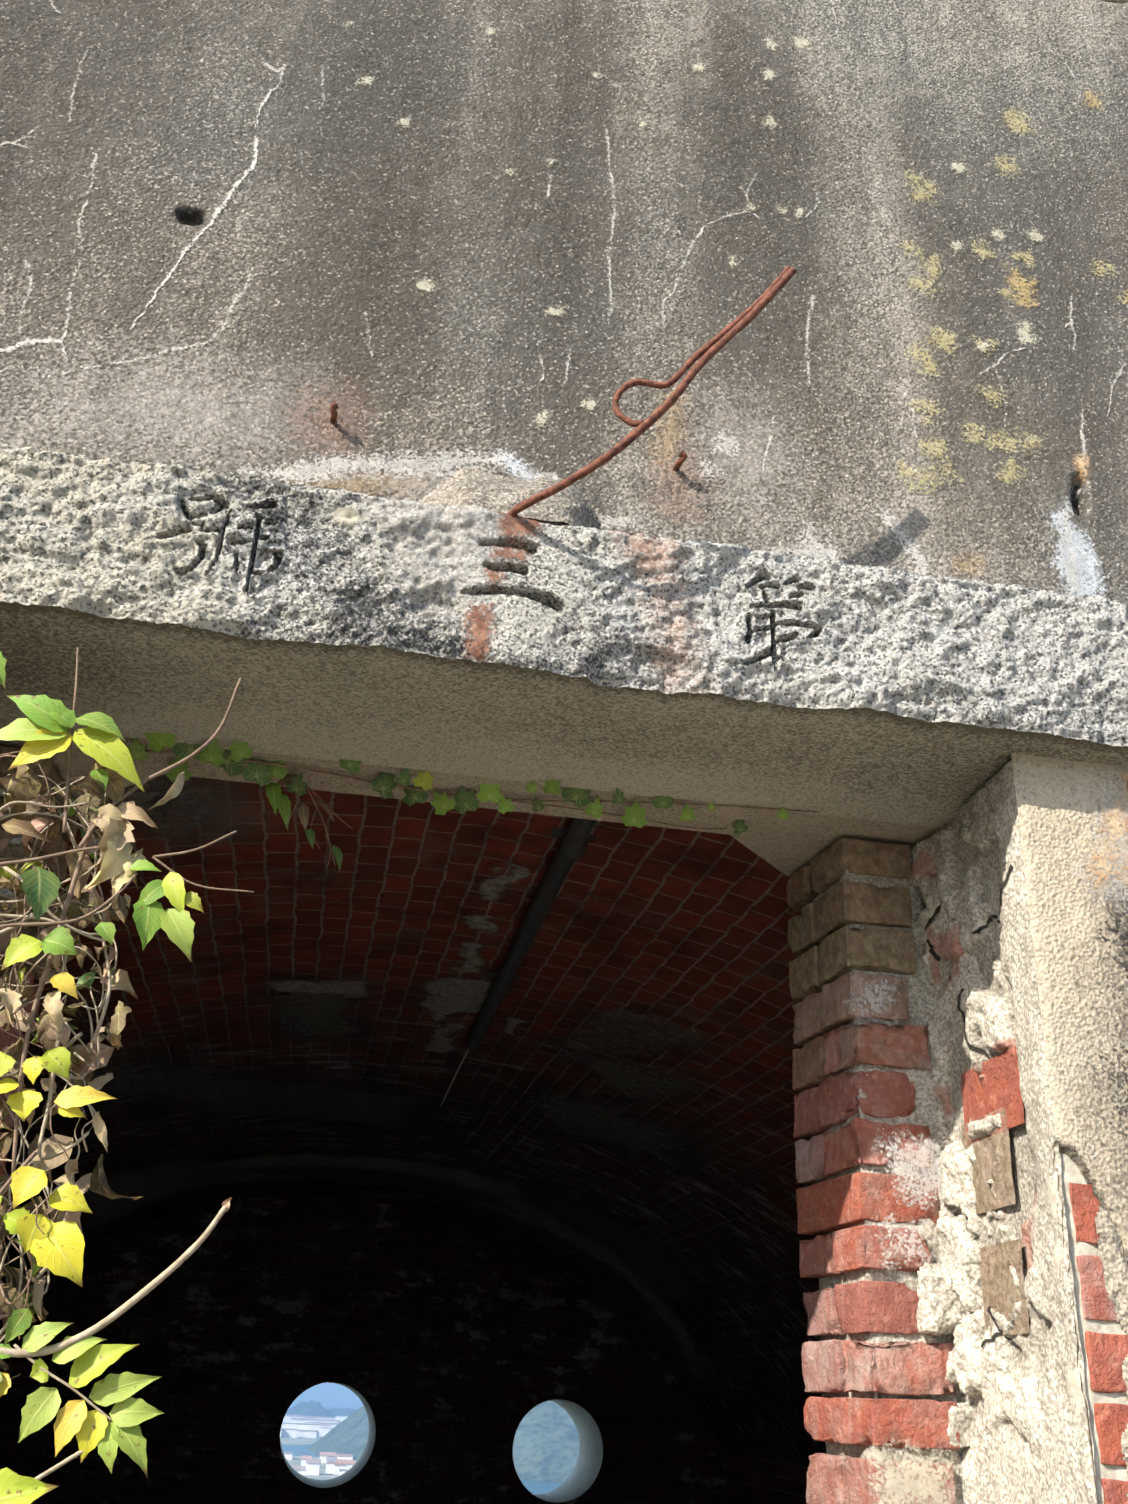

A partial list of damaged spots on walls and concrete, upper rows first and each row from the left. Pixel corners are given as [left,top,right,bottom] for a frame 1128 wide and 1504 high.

crack [0,63,286,377]
damp [232,447,558,485]
damp [700,430,740,477]
rust [462,513,543,661]
damp [877,505,930,576]
damp [1050,493,1106,598]
rust [1083,765,1128,890]
crack [972,864,1013,934]
crack [925,901,990,1059]
spalling [961,1046,1025,1215]
spalling [979,1239,1030,1336]
flaking render [1046,1137,1128,1504]